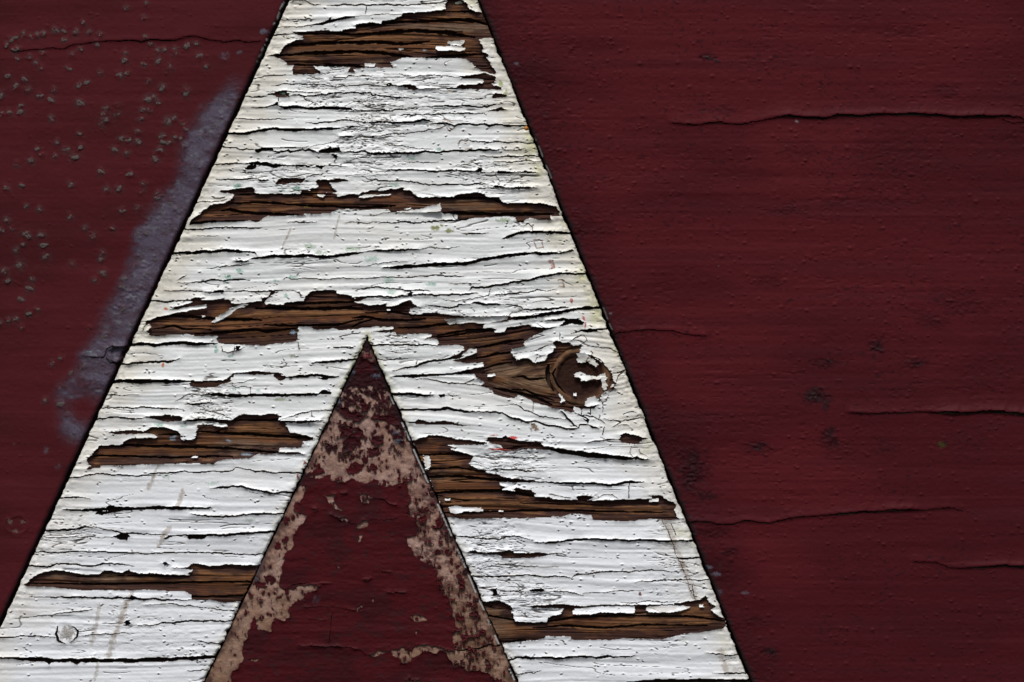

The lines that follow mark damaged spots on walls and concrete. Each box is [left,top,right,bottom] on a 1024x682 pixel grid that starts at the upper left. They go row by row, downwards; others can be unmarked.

crack [18,0,447,52]
peeling [269,0,507,112]
crack [672,112,1024,126]
peeling [189,178,562,225]
peeling [142,289,617,412]
crack [857,409,1024,417]
peeling [24,384,726,682]
crack [455,507,962,604]
crack [914,561,1024,569]